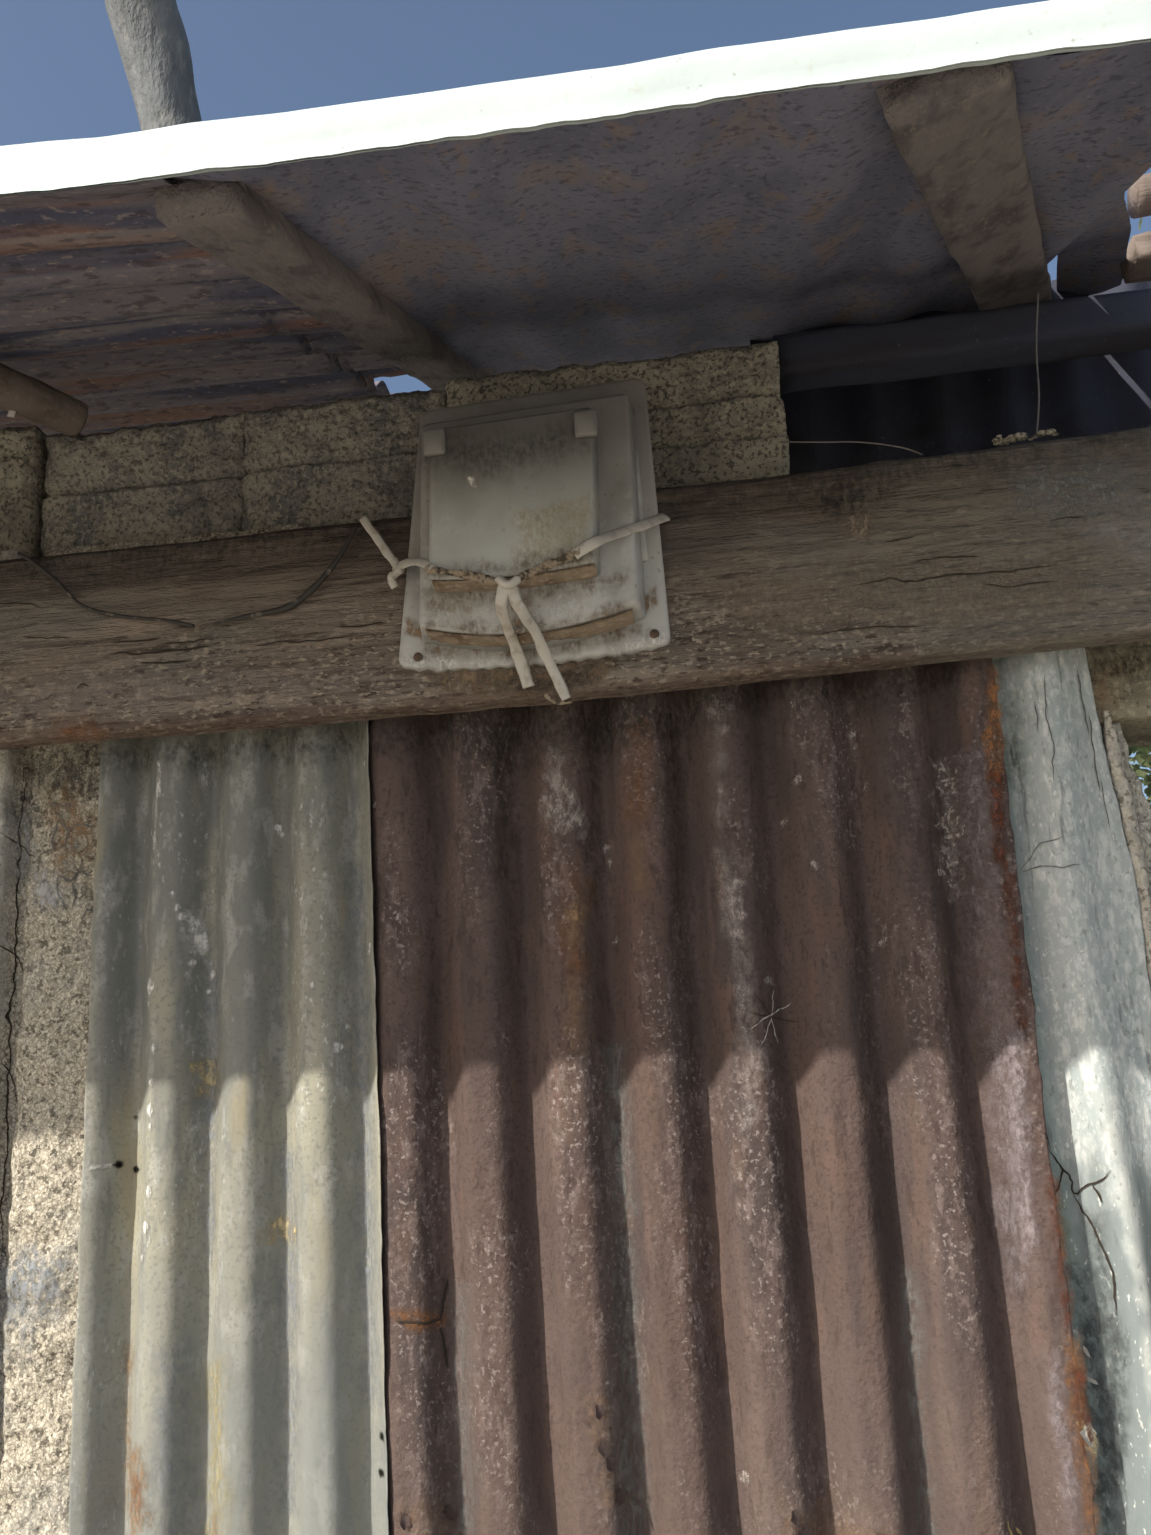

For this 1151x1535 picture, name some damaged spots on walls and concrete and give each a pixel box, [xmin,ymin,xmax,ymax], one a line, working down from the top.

corrosion [982,670,1026,1028]
crack [0,768,96,1257]
crack [1047,1136,1117,1309]
corrosion [585,1403,616,1472]
corrosion [1066,1345,1095,1485]
corrosion [398,1513,411,1530]
corrosion [791,1510,808,1535]